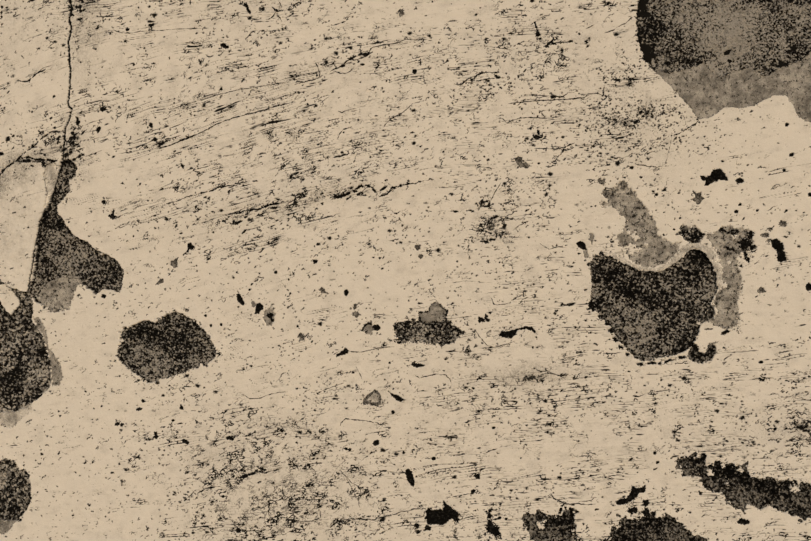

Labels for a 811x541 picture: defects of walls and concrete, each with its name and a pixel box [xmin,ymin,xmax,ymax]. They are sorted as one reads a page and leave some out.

flaking render [637,0,811,122]
crack [0,130,73,176]
spalling [691,160,744,204]
flaking render [0,161,124,428]
flaking render [119,309,222,383]
spalling [393,302,465,346]
flaking render [576,179,786,366]
flaking render [0,459,32,534]
spalling [414,502,460,534]
flaking render [522,506,590,541]
flaking render [601,485,707,541]
flaking render [675,452,811,525]